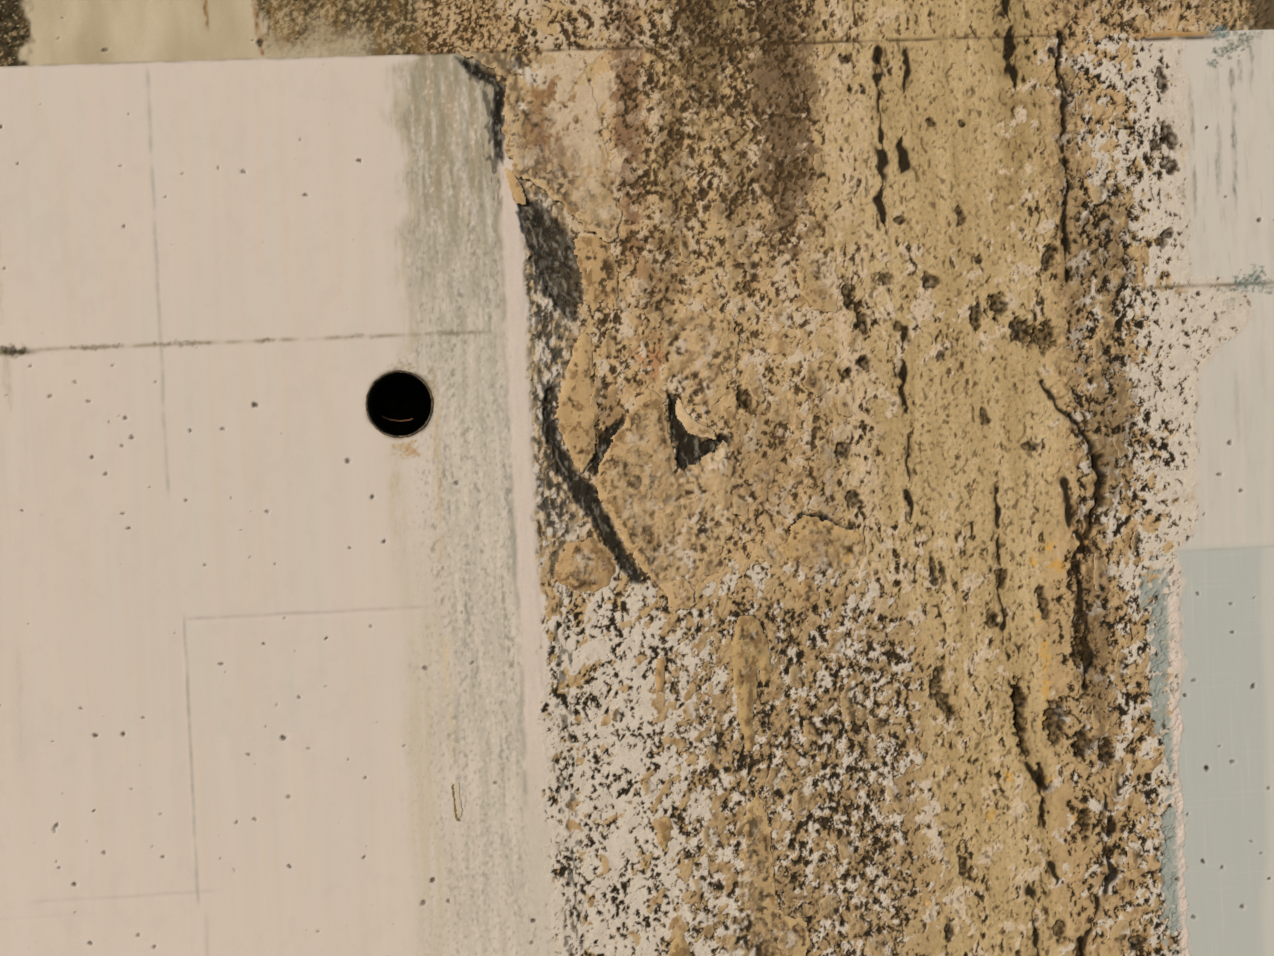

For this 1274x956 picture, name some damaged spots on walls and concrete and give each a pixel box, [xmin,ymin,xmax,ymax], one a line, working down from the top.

leakage [0,0,31,67]
leakage [0,342,32,418]
leakage [64,343,126,352]
leakage [153,339,211,350]
leakage [256,0,830,956]
spalling [455,0,1254,956]